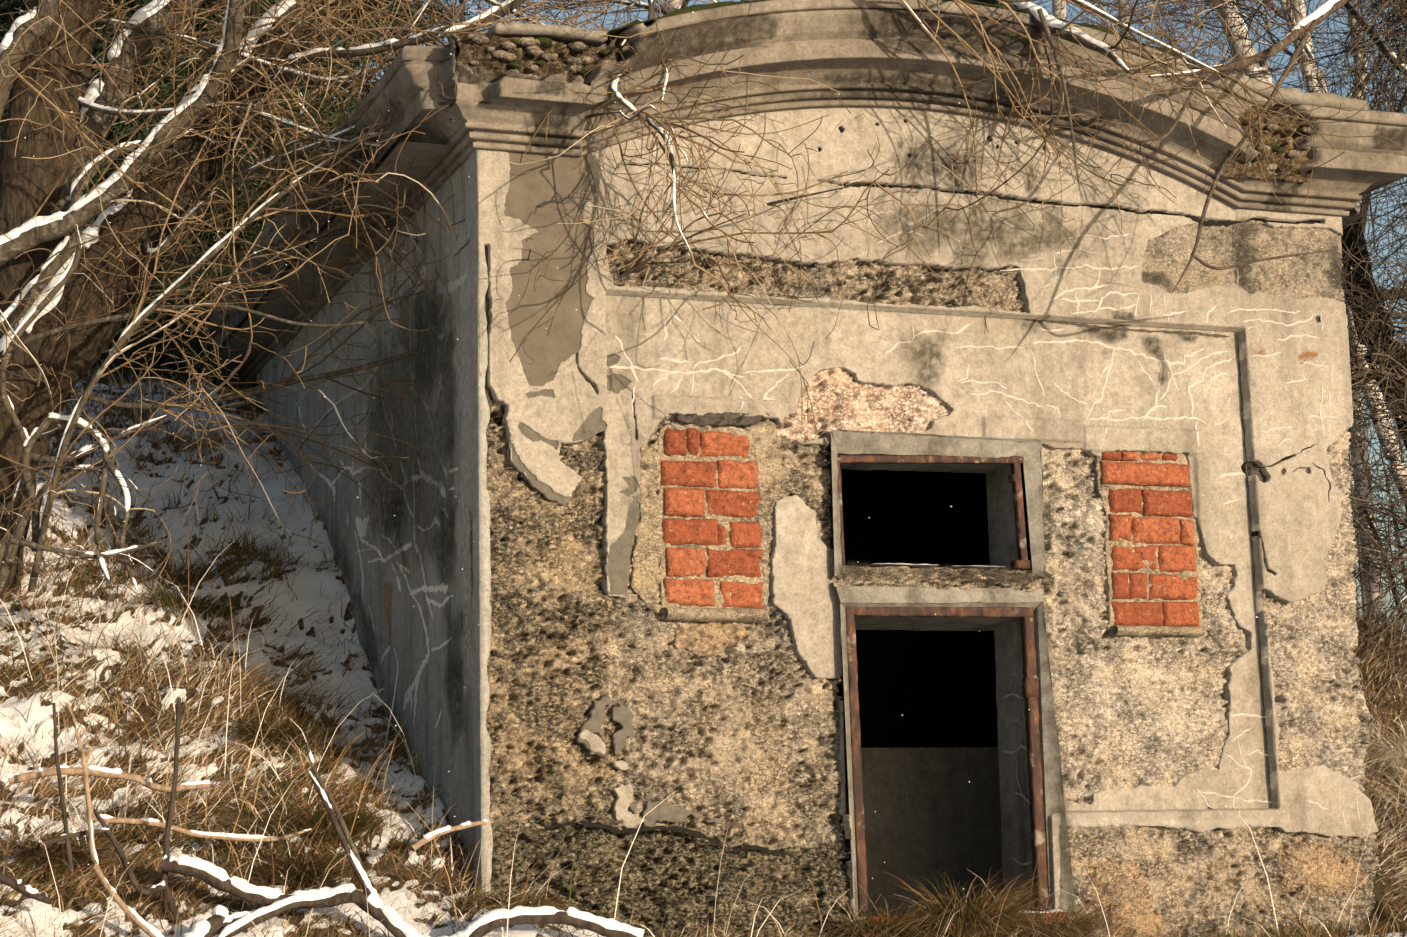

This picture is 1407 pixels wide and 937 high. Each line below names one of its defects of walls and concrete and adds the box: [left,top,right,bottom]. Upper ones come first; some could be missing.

crack [274,344,458,728]
leakage [347,257,478,731]
crack [575,314,804,440]
spalling [486,368,950,937]
flaking render [504,152,1026,398]
crack [819,181,1338,819]
spalling [1029,444,1249,804]
spalling [1059,824,1379,937]
spalling [1141,220,1345,302]
spalling [1263,428,1370,793]
crack [1309,797,1360,828]